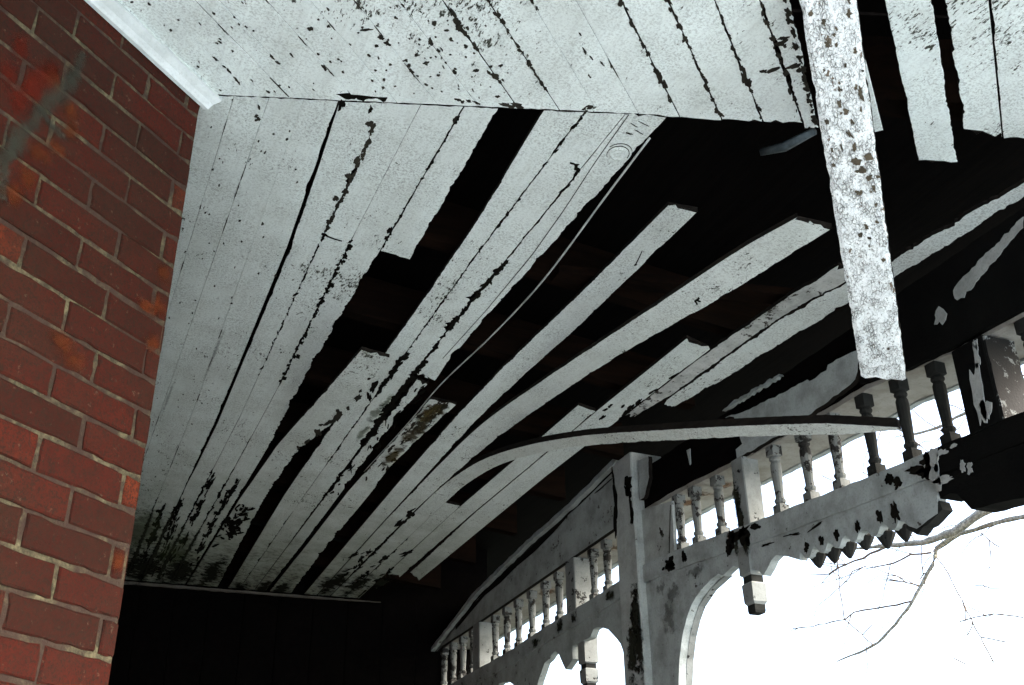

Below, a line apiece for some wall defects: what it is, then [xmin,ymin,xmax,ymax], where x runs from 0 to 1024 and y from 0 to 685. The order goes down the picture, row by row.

peeling [324,121,376,232]
peeling [535,105,594,177]
peeling [716,0,881,207]
peeling [448,259,509,331]
peeling [934,306,947,325]
peeling [953,217,1024,300]
peeling [297,238,490,495]
peeling [599,389,658,420]
peeling [969,339,992,426]
peeling [611,466,634,539]
peeling [875,443,973,524]
leakage [126,509,229,587]